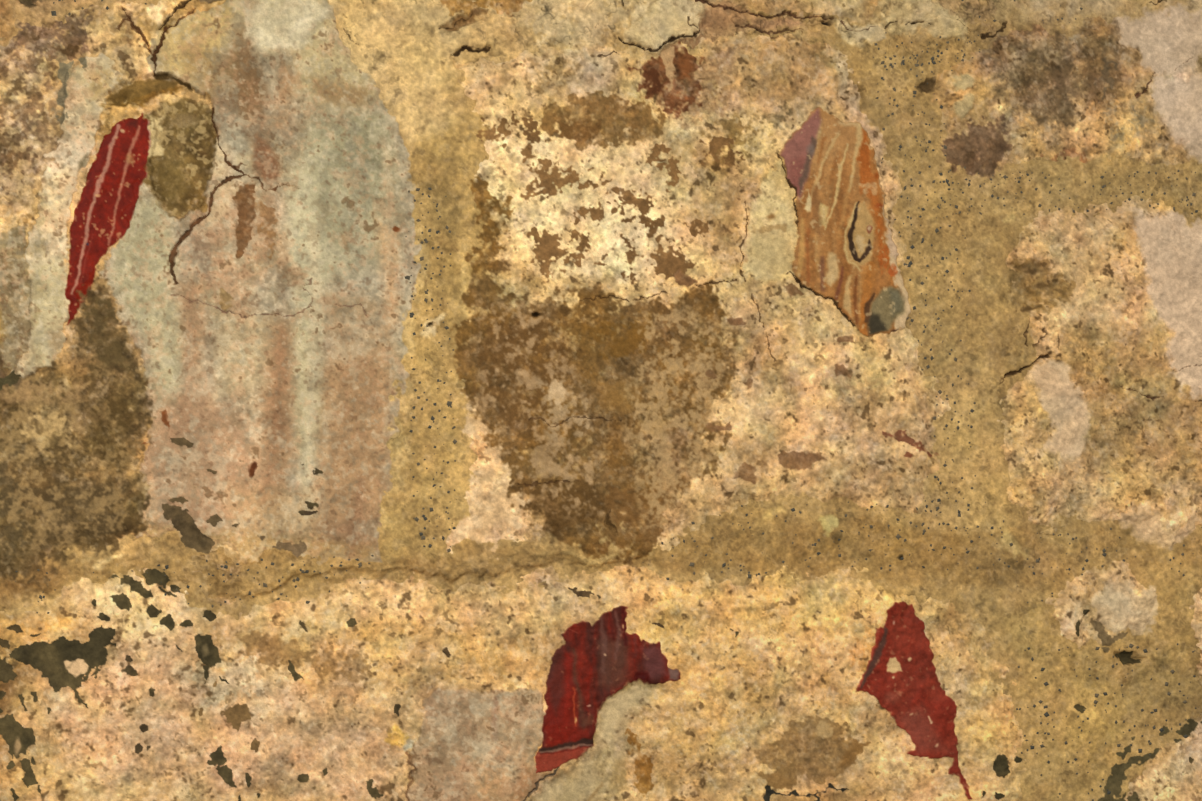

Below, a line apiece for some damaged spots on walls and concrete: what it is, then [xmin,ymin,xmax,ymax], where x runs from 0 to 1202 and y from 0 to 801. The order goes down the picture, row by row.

crack [116,0,194,77]
crack [169,107,371,320]
leakage [446,88,749,566]
leakage [0,265,242,591]
leakage [296,498,319,517]
leakage [0,568,229,801]
leakage [220,700,252,733]
leakage [235,618,376,686]
leakage [297,767,328,783]
leakage [364,778,384,801]
crack [405,751,418,801]
crack [524,767,560,801]